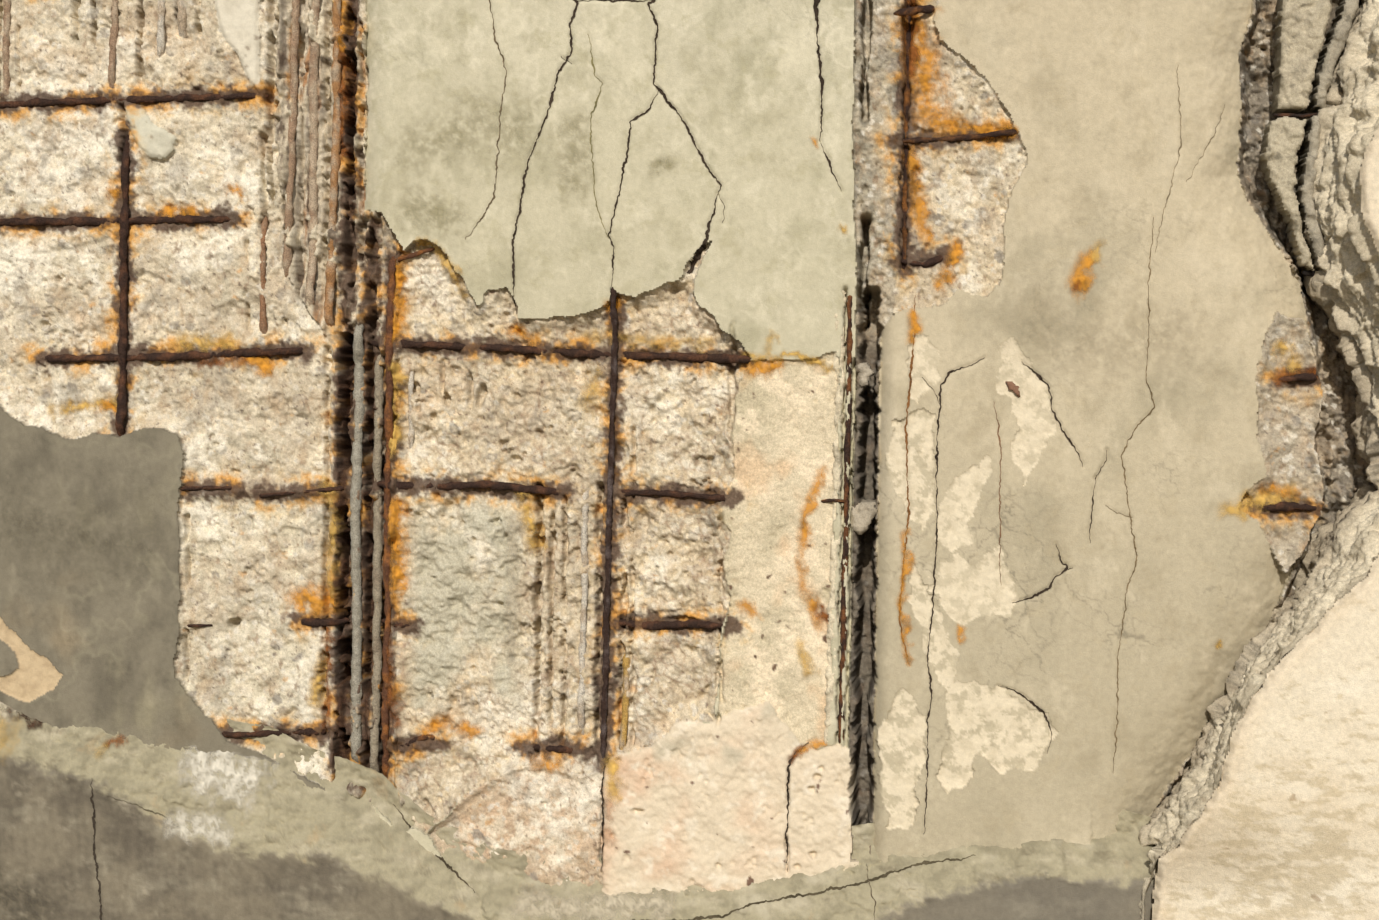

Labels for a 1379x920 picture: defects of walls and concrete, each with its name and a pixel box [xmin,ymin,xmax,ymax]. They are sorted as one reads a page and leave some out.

corrosion [337,2,358,213]
crack [465,0,725,307]
crack [813,0,841,189]
corrosion [904,0,1017,139]
spalling [893,0,1028,313]
corrosion [292,348,408,758]
spalling [0,0,877,886]
corrosion [797,473,829,625]
peeling [875,334,1059,831]
crack [994,65,1225,771]
crack [1138,0,1379,920]
corrosion [1226,484,1300,518]